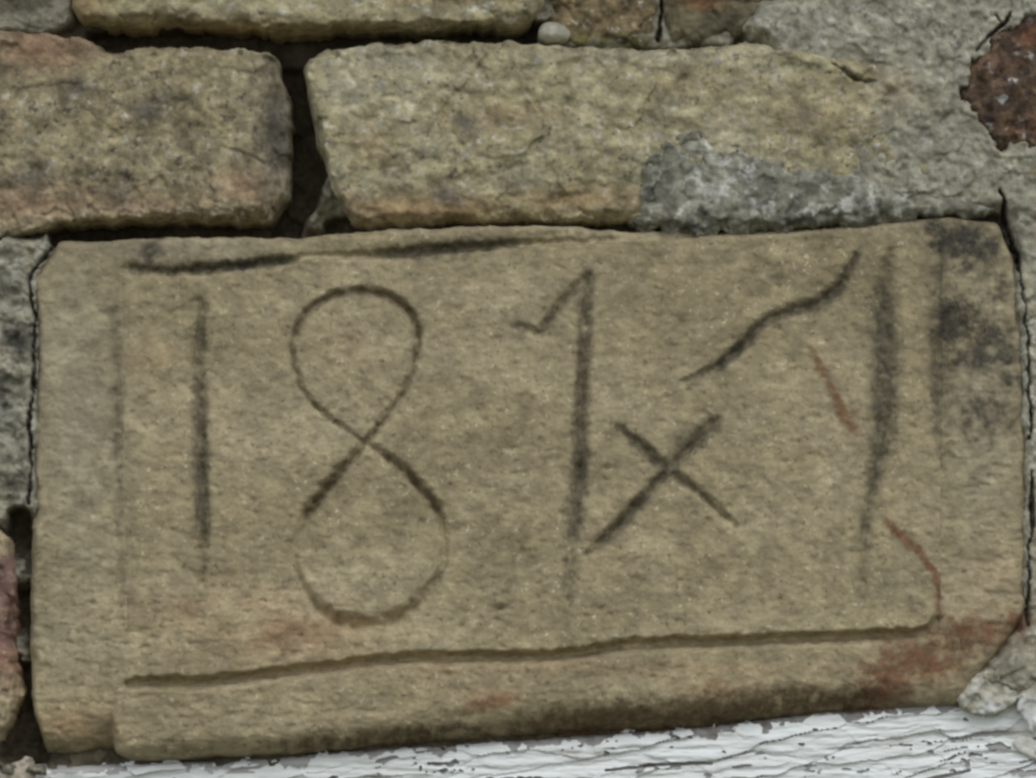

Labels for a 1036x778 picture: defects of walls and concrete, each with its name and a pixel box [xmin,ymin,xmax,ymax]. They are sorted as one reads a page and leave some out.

crack [999,190,1032,440]
crack [1024,470,1035,626]
peeling [35,671,1036,778]